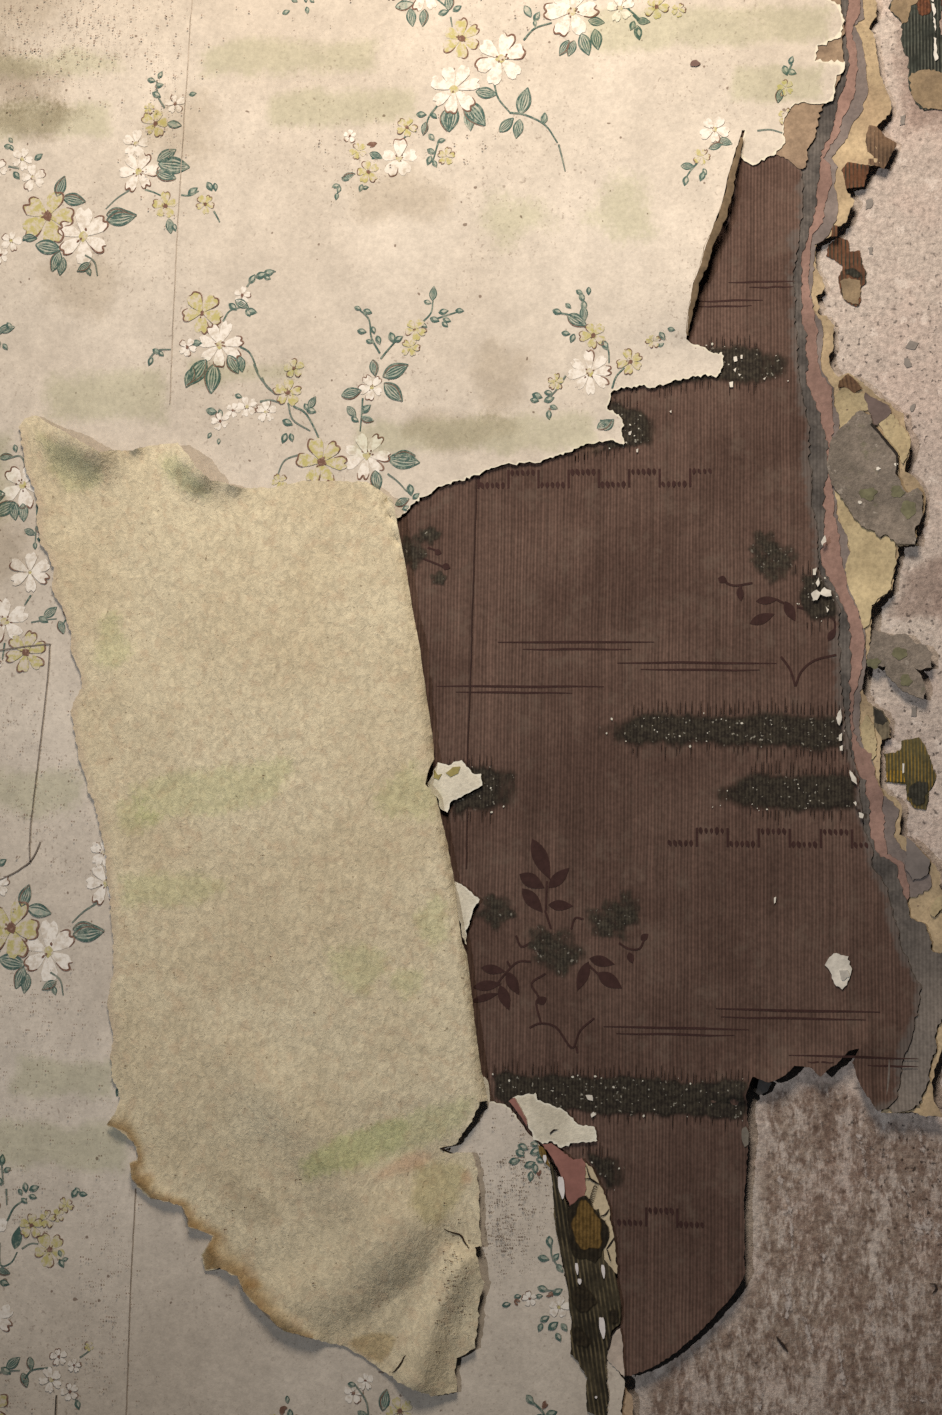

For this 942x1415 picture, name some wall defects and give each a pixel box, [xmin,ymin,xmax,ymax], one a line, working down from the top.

flaking render [827,374,923,545]
flaking render [866,630,933,699]
damp [606,698,860,822]
damp [435,1058,749,1354]